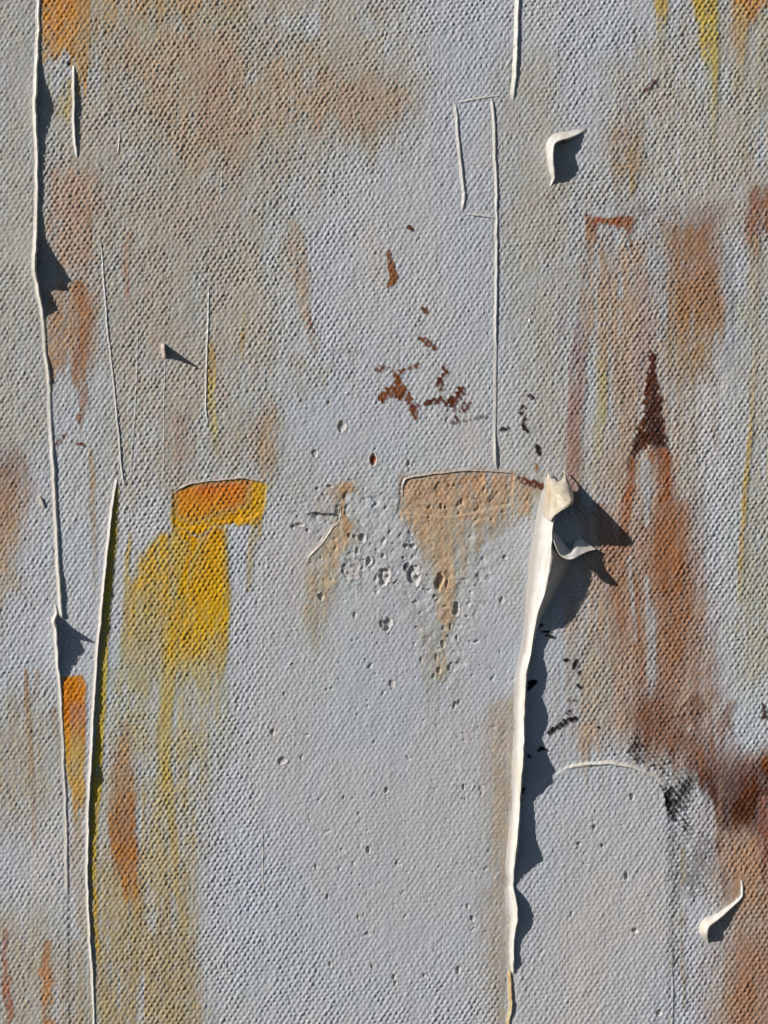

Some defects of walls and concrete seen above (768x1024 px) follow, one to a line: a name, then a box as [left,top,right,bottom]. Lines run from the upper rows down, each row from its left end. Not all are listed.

peeling [546,129,585,187]
corrosion [585,215,634,257]
corrosion [597,219,768,840]
peeling [699,880,744,944]